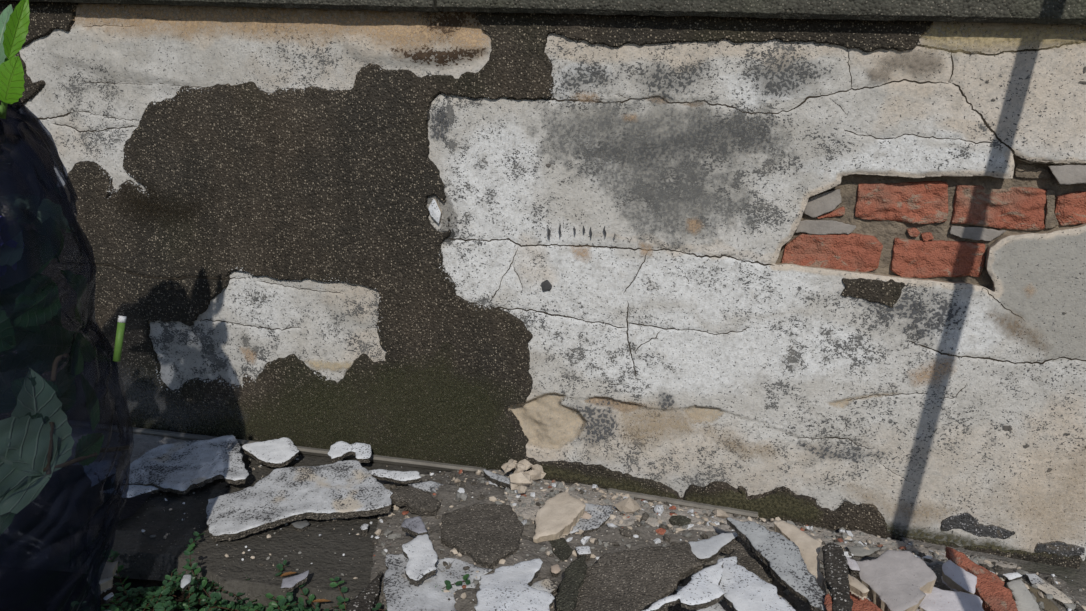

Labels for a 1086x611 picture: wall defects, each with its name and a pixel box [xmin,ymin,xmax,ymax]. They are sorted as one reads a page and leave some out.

flaking render [19,3,490,197]
crack [504,39,1086,165]
flaking render [149,270,387,390]
crack [446,238,775,385]
flaking render [426,22,1086,561]
crack [909,341,1086,364]
water stain [567,393,687,447]
water stain [797,443,883,465]
crack [799,384,967,483]
flaking render [918,560,984,611]
flaking render [1003,572,1059,611]